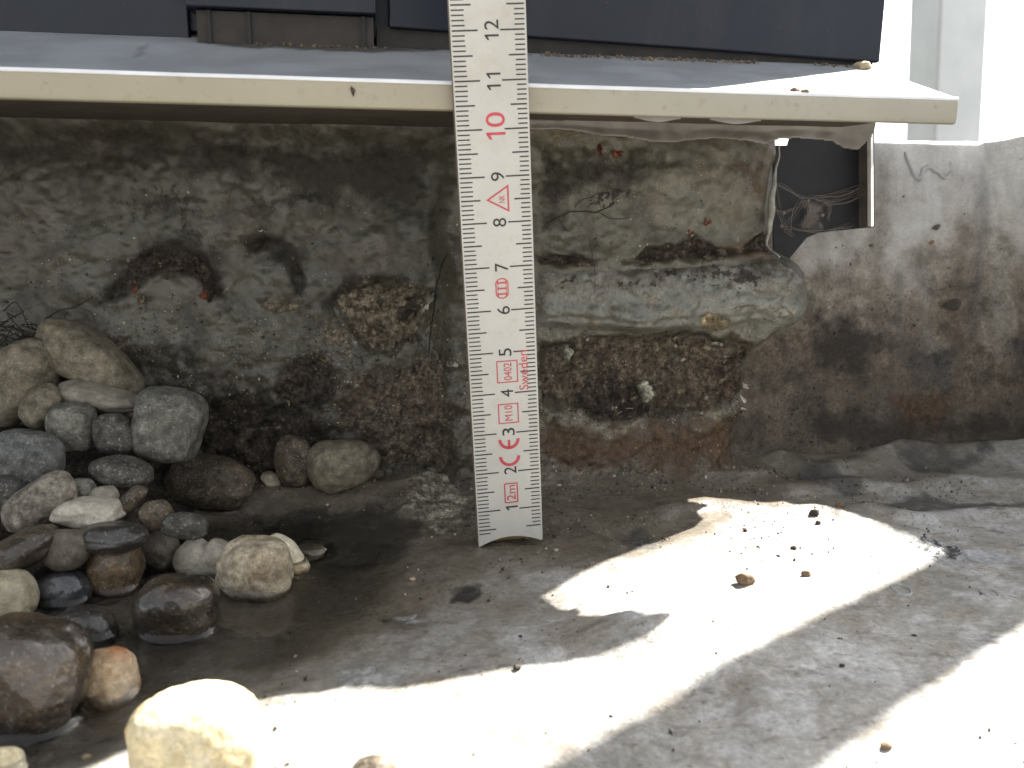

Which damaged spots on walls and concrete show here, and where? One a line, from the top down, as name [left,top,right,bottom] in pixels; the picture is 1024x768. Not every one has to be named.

peeling [529,119,876,150]
spalling [540,251,597,267]
spalling [632,230,768,265]
spalling [538,312,749,423]
damp [262,504,421,578]